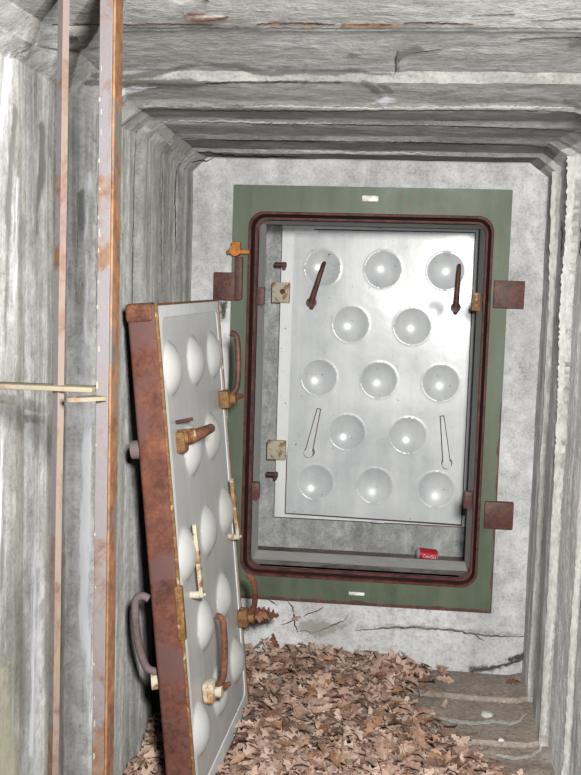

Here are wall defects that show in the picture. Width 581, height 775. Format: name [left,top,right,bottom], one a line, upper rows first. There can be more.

crack [123,14,581,40]
crack [394,49,442,75]
crack [122,108,581,303]
crack [269,600,523,640]